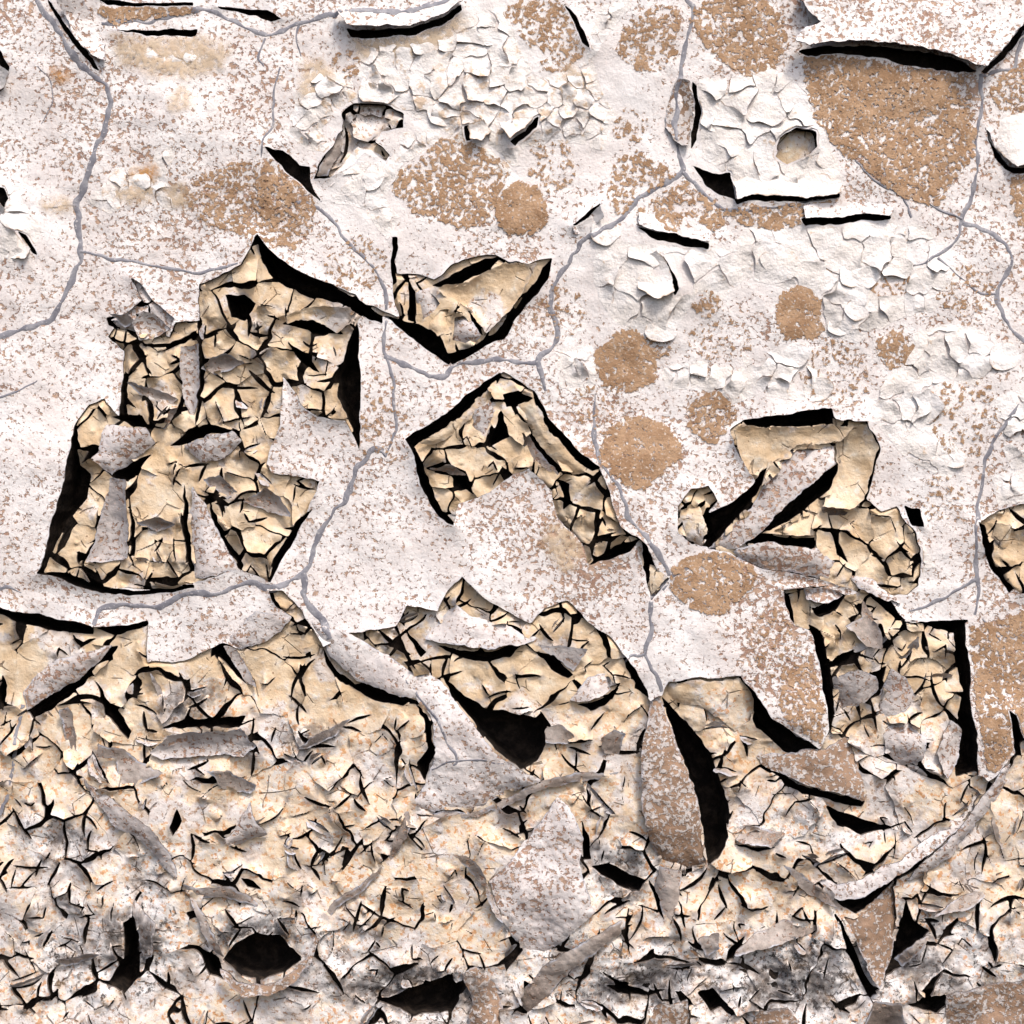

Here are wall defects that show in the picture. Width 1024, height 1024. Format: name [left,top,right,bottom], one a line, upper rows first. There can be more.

crack [0,585,21,593]
crack [0,381,37,398]
crack [0,0,238,339]
peeling [37,0,631,596]
crack [92,0,840,640]
peeling [0,323,1024,1024]
crack [591,394,745,692]
crack [852,30,1024,343]
crack [909,404,1019,649]